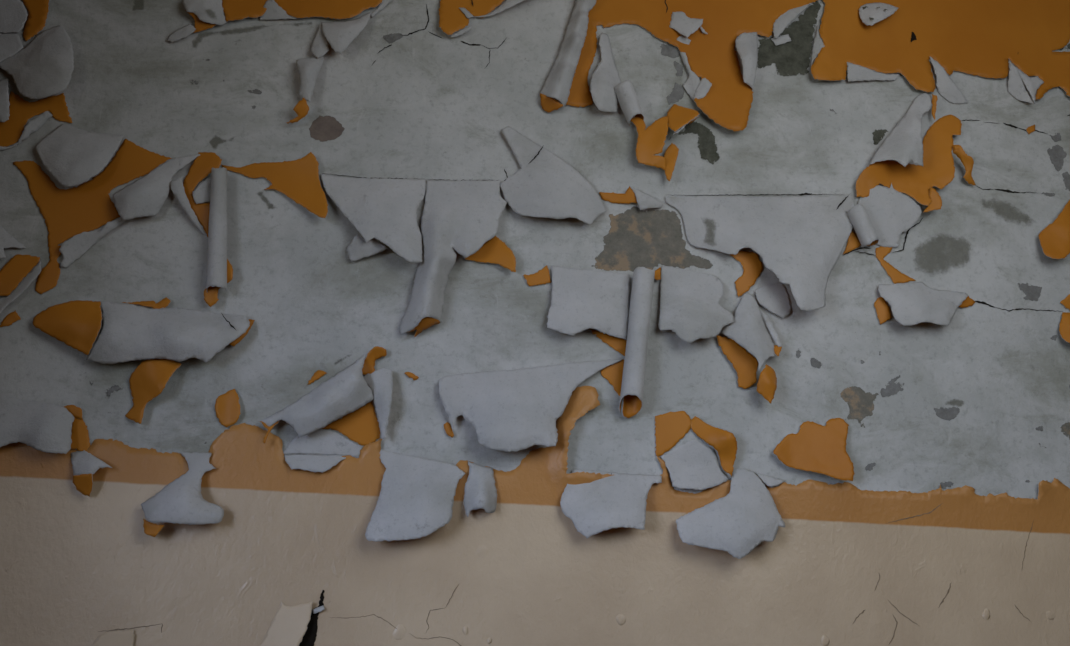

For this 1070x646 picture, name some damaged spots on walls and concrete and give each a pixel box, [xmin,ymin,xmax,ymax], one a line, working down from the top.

peeling [0,0,74,122]
peeling [0,111,124,187]
peeling [590,11,720,182]
spalling [735,1,825,91]
peeling [32,137,255,424]
peeling [320,57,976,452]
peeling [0,393,112,497]
peeling [141,443,224,537]
peeling [260,346,497,542]
peeling [560,440,786,559]
peeling [773,375,904,481]
crack [333,584,461,646]